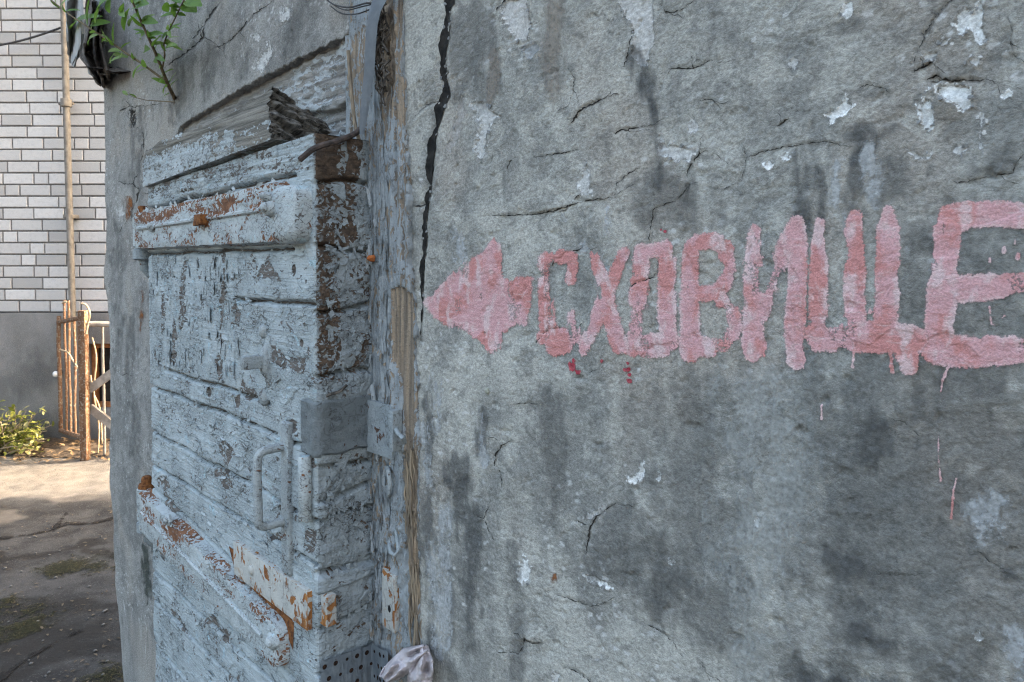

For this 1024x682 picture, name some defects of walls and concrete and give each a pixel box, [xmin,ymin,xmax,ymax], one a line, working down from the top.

crack [170,1,272,64]
crack [413,0,455,336]
peeling [469,99,499,160]
crack [492,168,638,216]
crack [558,69,617,123]
crack [629,113,855,289]
leakage [796,125,879,225]
peeling [823,94,856,126]
peeling [915,80,988,157]
peeling [324,80,392,404]
peeling [626,460,661,485]
leakage [418,387,489,660]